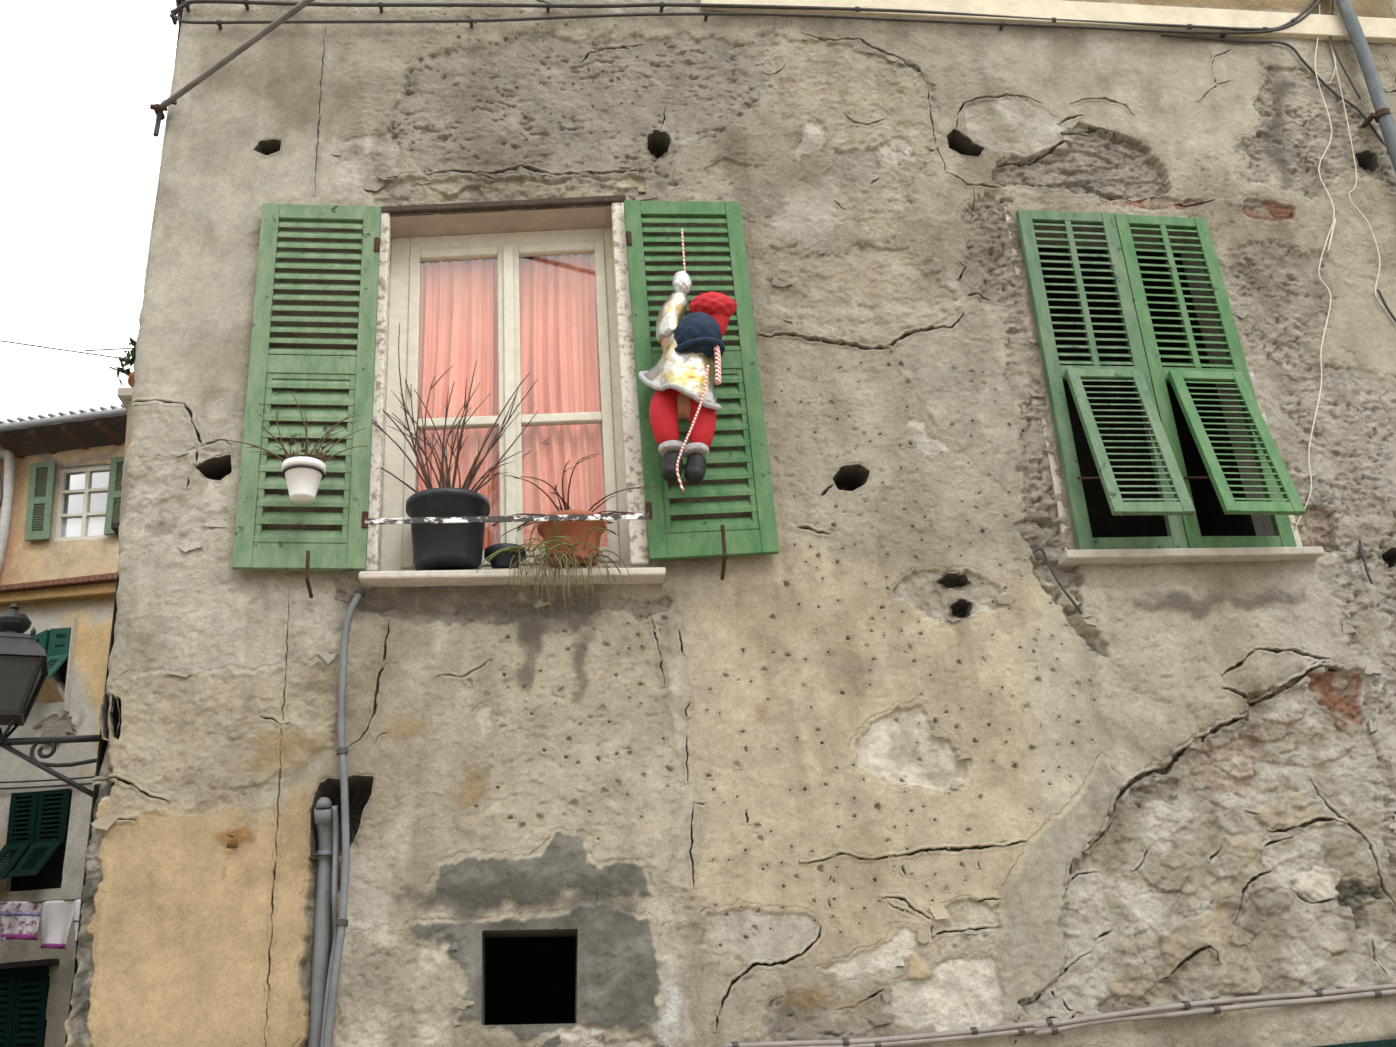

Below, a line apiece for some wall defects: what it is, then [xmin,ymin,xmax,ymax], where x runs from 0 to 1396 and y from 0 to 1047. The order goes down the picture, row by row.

crack [801,31,1216,223]
crack [758,260,990,354]
flaking render [183,0,1211,1047]
flaking render [1024,60,1396,1026]
crack [346,618,393,749]
crack [1063,645,1342,894]
water stain [424,879,633,919]
efflorescence [652,983,681,1047]
crack [712,899,834,1032]
crack [799,837,1027,941]
crack [1009,927,1114,1046]
crack [1158,777,1396,984]